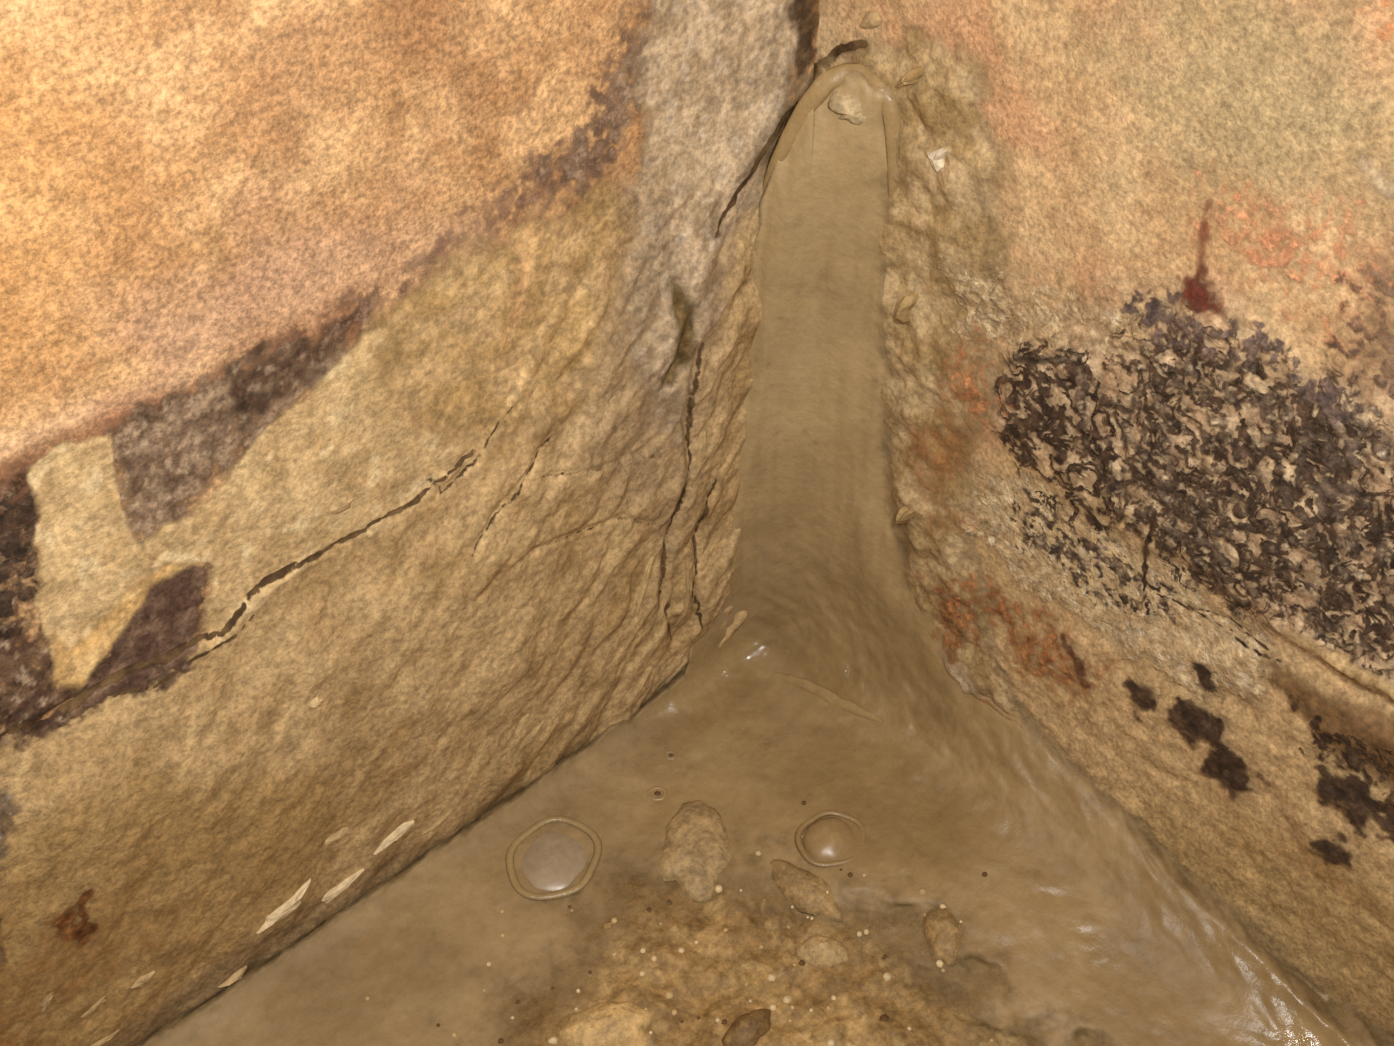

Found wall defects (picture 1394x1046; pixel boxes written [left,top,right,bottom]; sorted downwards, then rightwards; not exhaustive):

corrosion [1182,200,1221,313]
crack [0,407,512,739]
leakage [932,252,1394,867]